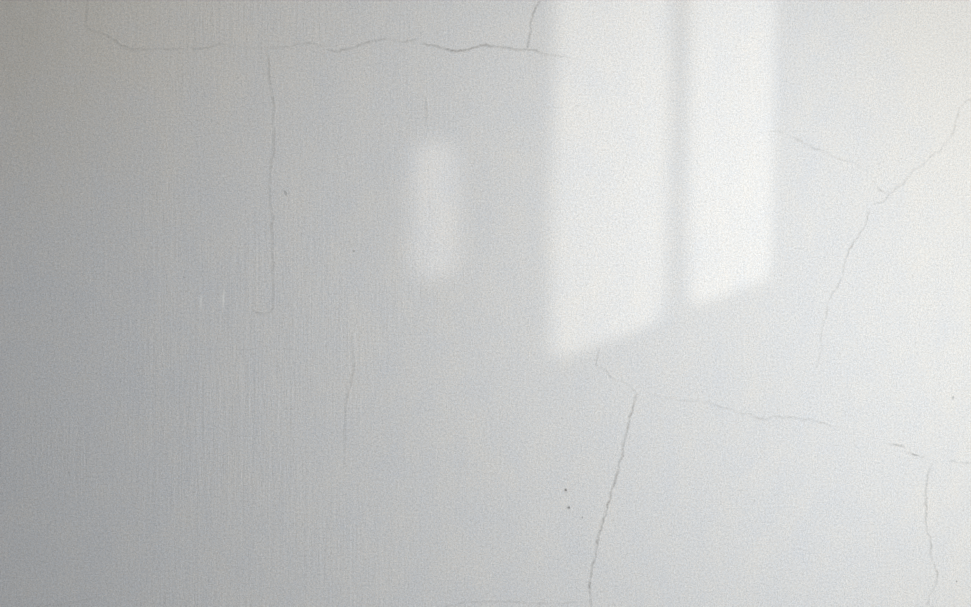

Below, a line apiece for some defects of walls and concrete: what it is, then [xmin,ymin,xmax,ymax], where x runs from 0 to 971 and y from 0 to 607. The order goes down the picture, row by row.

crack [84,0,577,315]
crack [815,98,971,370]
crack [886,441,971,607]